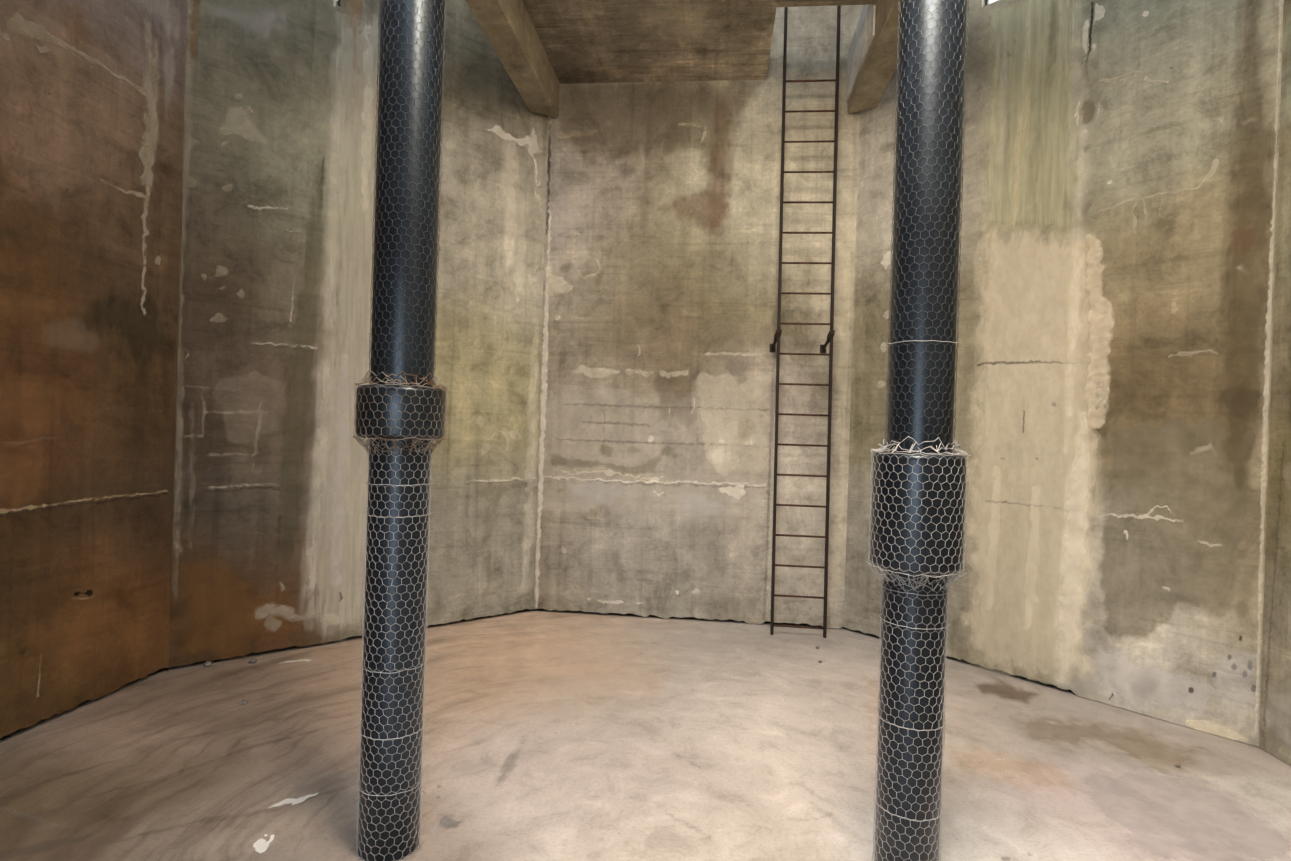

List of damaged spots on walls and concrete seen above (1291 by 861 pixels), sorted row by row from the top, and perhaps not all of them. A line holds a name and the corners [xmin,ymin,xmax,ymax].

damp [94,38,173,355]
crack [0,490,168,516]